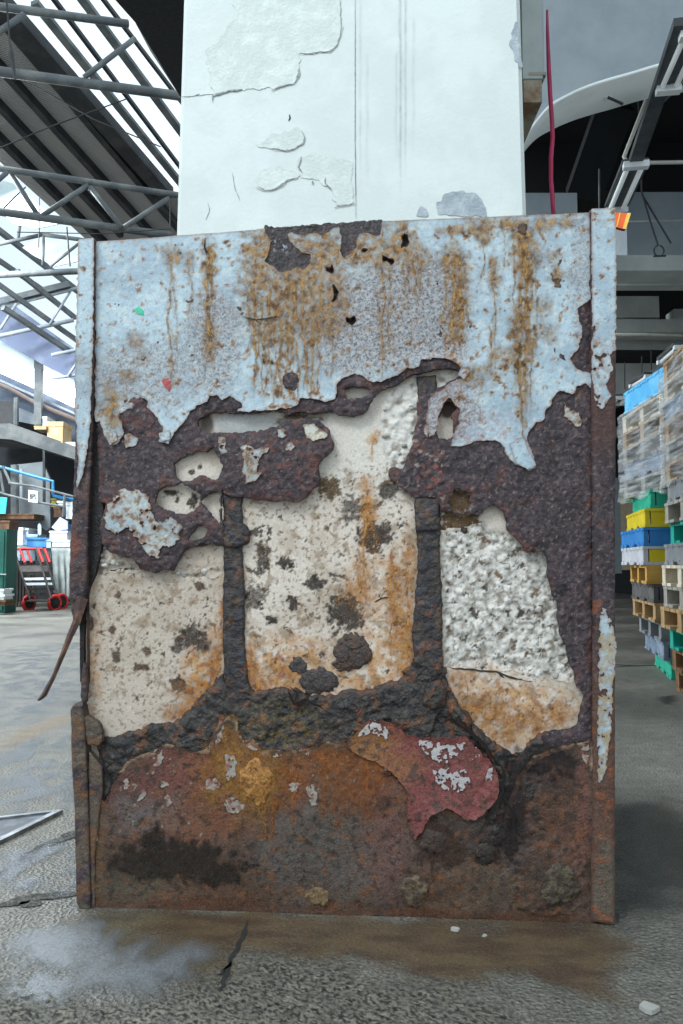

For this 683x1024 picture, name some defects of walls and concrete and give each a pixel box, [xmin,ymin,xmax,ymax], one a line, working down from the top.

corrosion [238,222,427,401]
peeling [74,190,617,487]
corrosion [436,217,570,438]
peeling [205,754,237,790]
corrosion [164,493,294,719]
peeling [288,782,317,806]
corrosion [275,463,482,696]
corrosion [155,677,628,994]
peeling [348,702,499,840]
crack [450,667,532,682]
peeling [581,608,617,782]
crack [217,921,248,992]